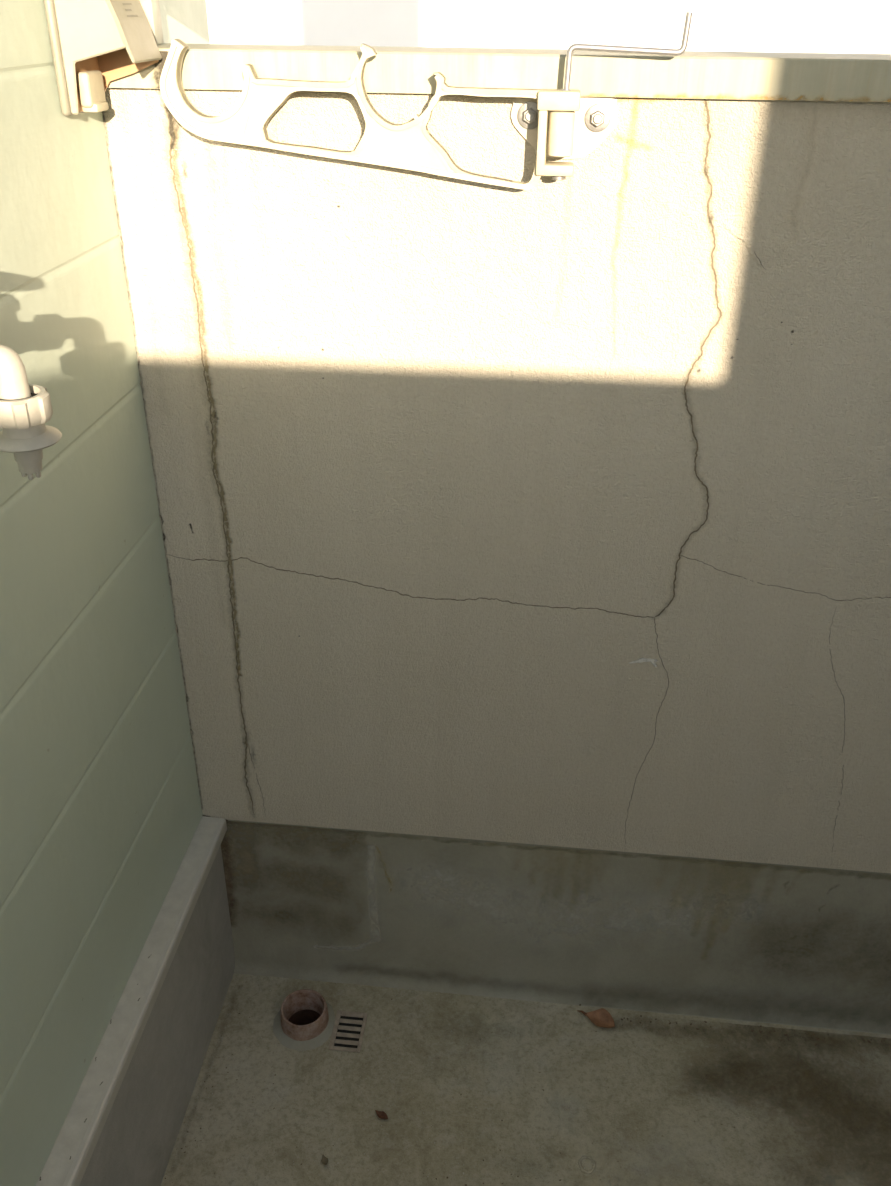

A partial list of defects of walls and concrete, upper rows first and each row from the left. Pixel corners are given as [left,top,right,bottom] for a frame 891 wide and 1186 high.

crack [166,99,891,866]